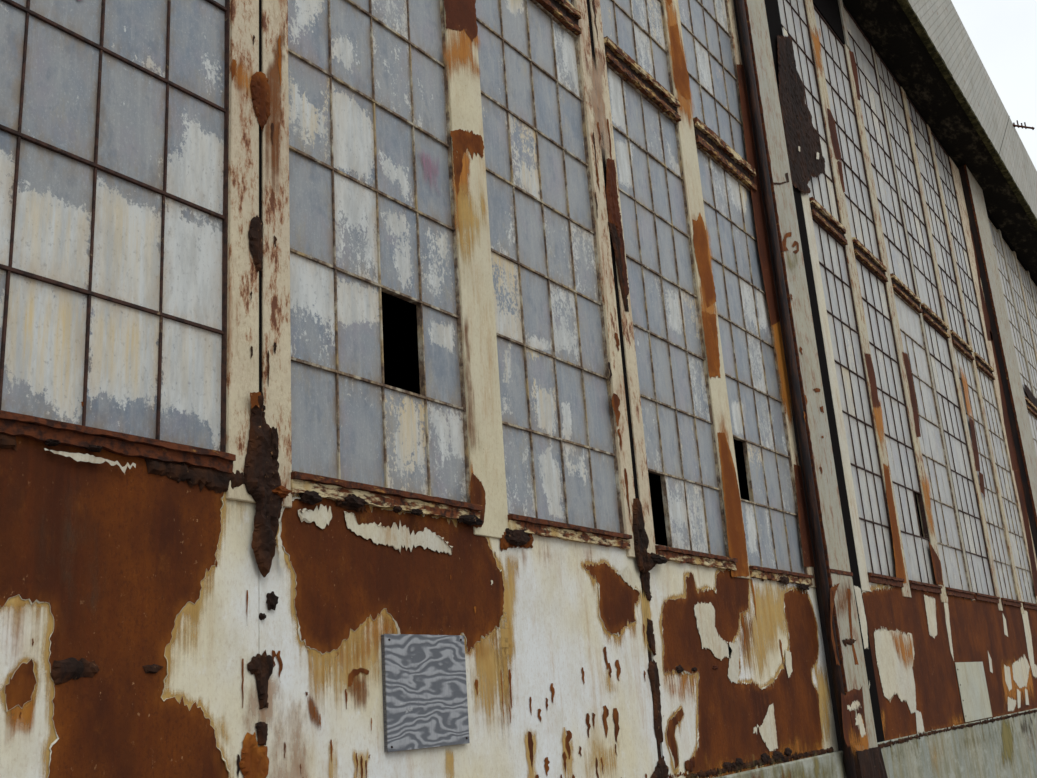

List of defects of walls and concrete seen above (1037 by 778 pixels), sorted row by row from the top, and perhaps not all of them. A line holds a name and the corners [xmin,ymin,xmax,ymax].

corrosion [444,0,480,75]
corrosion [665,0,693,123]
corrosion [692,214,721,379]
corrosion [736,64,820,423]
corrosion [902,352,921,437]
corrosion [960,368,985,496]
corrosion [969,224,1037,596]
corrosion [0,436,230,778]
corrosion [276,467,518,730]
corrosion [581,559,640,691]
corrosion [645,420,1037,778]
corrosion [525,705,620,778]